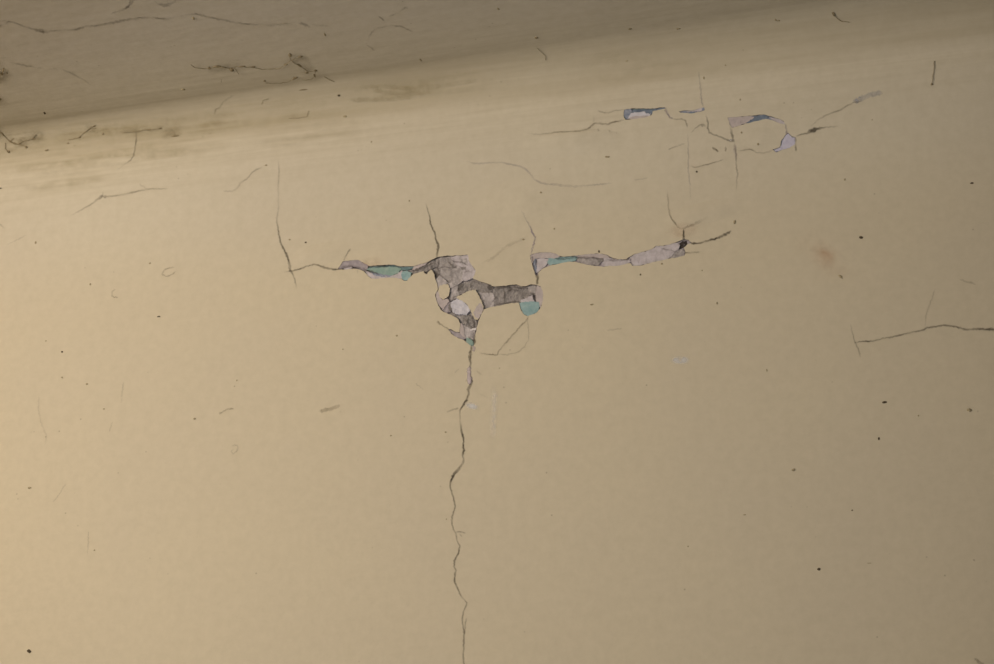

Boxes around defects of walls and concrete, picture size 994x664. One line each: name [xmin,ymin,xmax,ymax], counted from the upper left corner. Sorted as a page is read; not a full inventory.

peeling [624,107,665,120]
peeling [728,114,796,152]
flaking render [338,239,691,346]
crack [461,346,475,408]